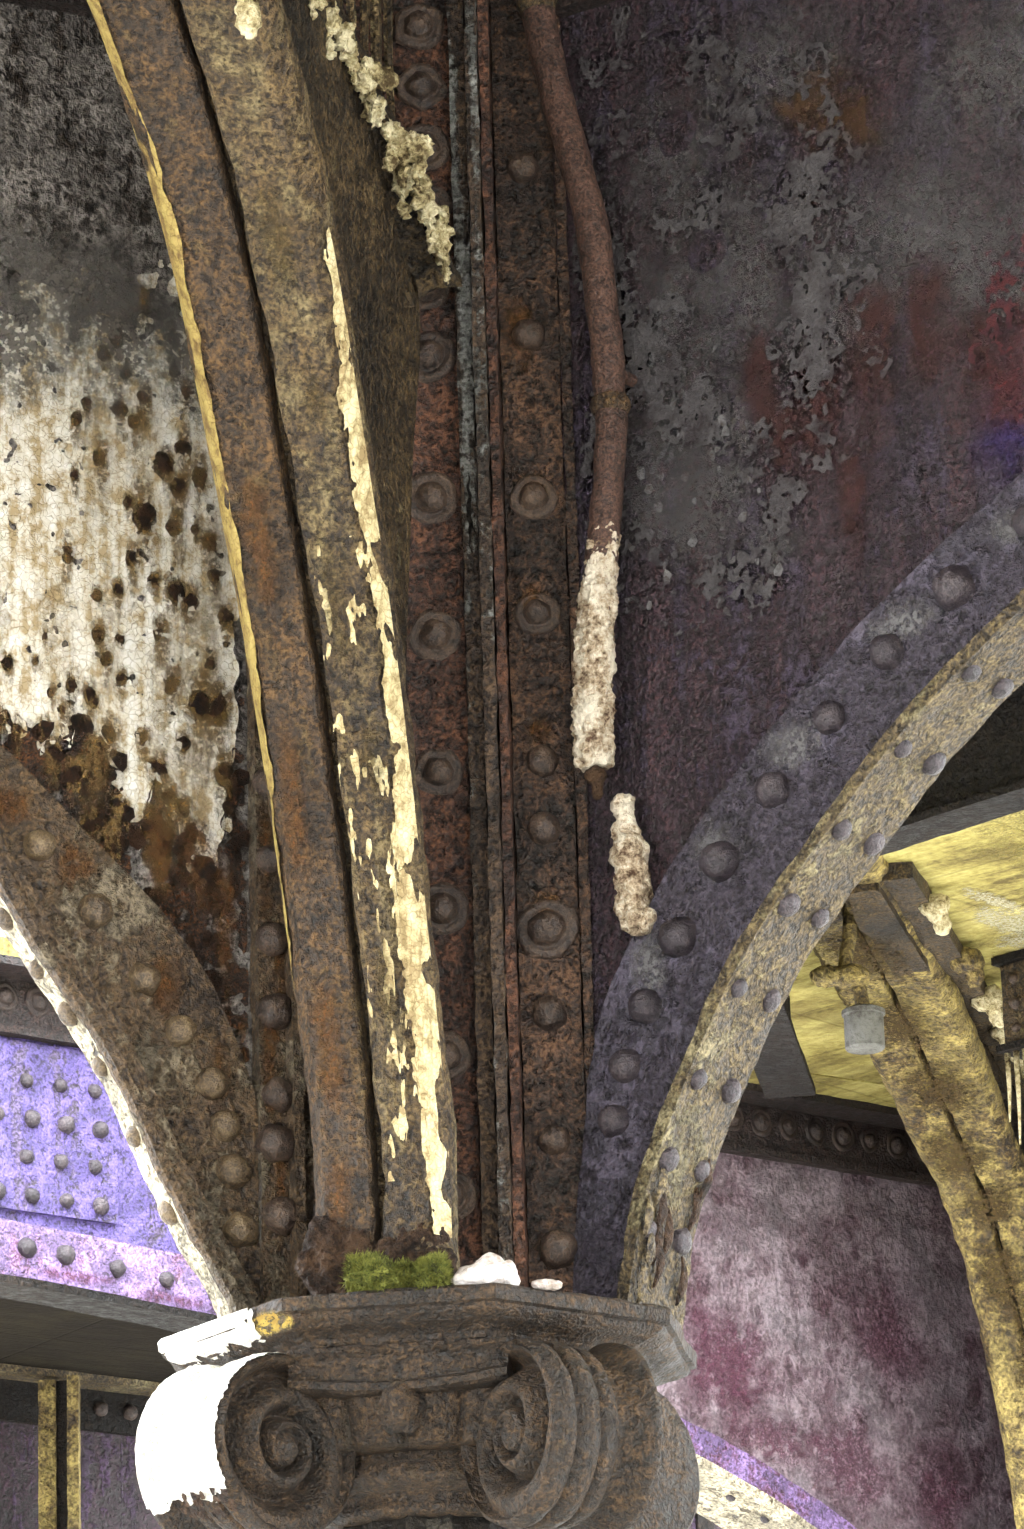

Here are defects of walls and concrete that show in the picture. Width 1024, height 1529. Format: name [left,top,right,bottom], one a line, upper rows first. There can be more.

water stain [234,0,262,40]
water stain [307,0,455,285]
peeling [0,0,294,983]
corrosion [0,654,14,681]
corrosion [31,629,48,667]
corrosion [40,316,237,1006]
peeling [314,228,452,1238]
efflorescence [570,521,657,937]
peeling [205,969,221,993]
efflorescence [950,946,1024,1145]
corrosion [294,1215,458,1295]
peeling [135,1308,292,1520]